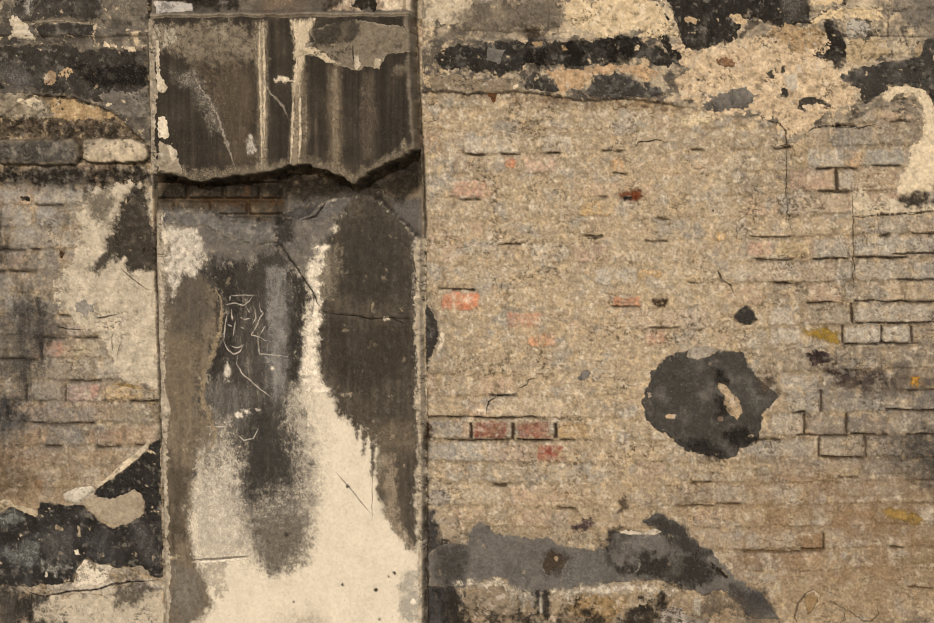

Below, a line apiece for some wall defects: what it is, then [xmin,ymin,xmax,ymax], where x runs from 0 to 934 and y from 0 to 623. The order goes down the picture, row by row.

leakage [160,0,413,182]
peeling [850,86,934,218]
peeling [0,0,271,623]
leakage [197,287,224,462]
leakage [252,214,293,269]
crack [281,246,413,324]
peeling [412,238,779,623]
spalling [805,349,834,367]